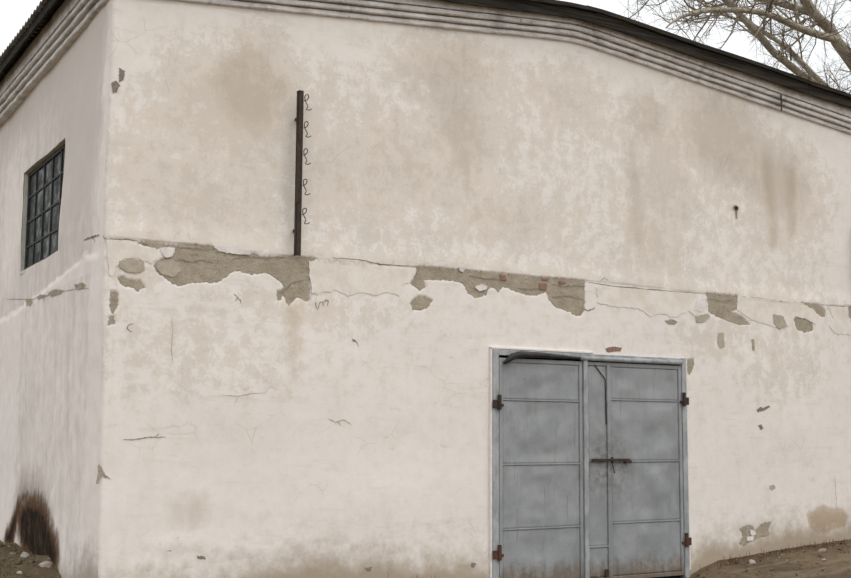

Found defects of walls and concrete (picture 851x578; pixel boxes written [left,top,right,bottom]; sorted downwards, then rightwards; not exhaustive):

spalling [26,289,63,306]
spalling [106,239,585,325]
flaking render [694,293,825,333]
crack [124,432,166,440]
damp [5,492,59,566]
spalling [739,521,771,546]